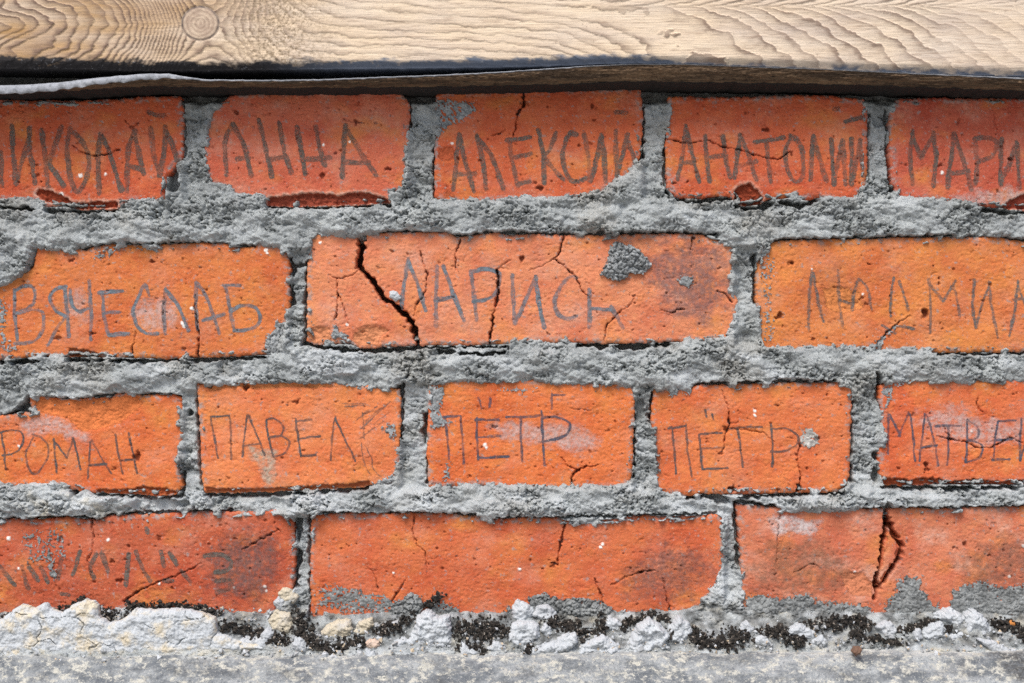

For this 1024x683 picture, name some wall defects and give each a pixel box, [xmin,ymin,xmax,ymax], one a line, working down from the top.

spalling [37,189,118,209]
spalling [268,193,389,207]
spalling [734,183,762,206]
crack [335,244,429,343]
crack [872,518,902,597]